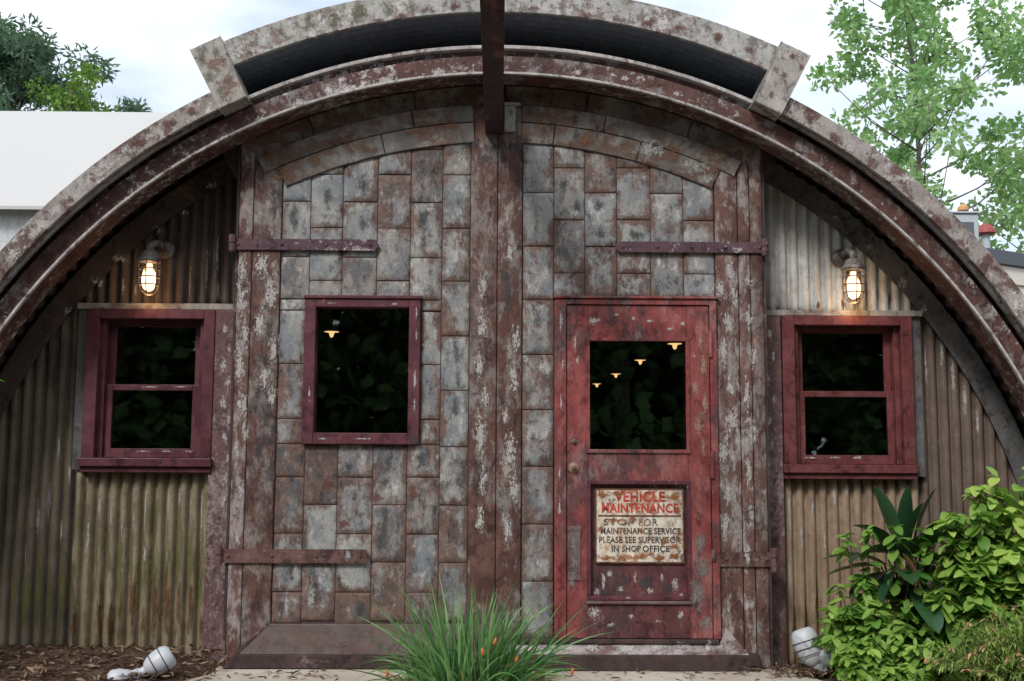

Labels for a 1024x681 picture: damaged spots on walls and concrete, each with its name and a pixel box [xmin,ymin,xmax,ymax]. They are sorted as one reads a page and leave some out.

peeling [219,252,280,508]
peeling [473,272,491,533]
peeling [502,408,520,503]
peeling [508,325,521,392]
peeling [692,261,775,541]
spalling [565,533,714,653]